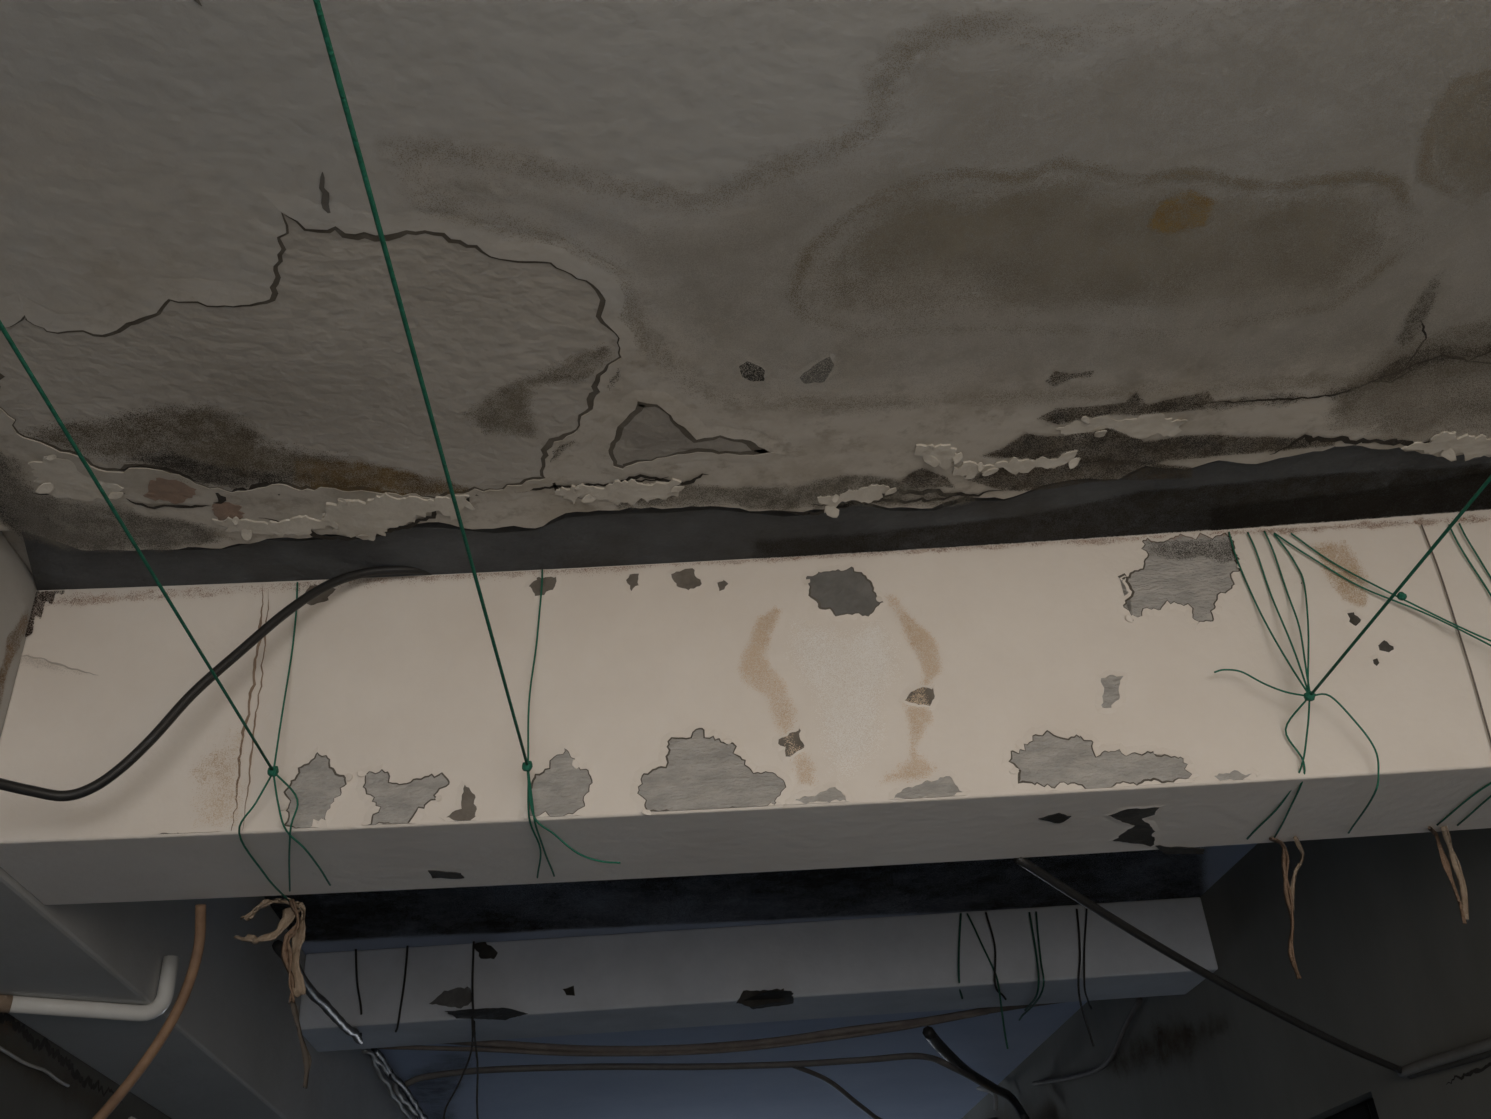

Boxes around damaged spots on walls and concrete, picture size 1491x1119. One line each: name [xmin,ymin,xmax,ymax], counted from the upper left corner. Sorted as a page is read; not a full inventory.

water stain [16,400,348,491]
water stain [464,343,619,439]
peeling [0,192,1491,632]
water stain [616,275,1491,512]
water stain [0,451,232,554]
water stain [1146,471,1491,564]
peeling [276,746,483,829]
peeling [518,743,600,819]
peeling [630,721,852,815]
flaking render [1038,813,1071,823]
peeling [1002,723,1261,792]
flaking render [1103,805,1205,855]